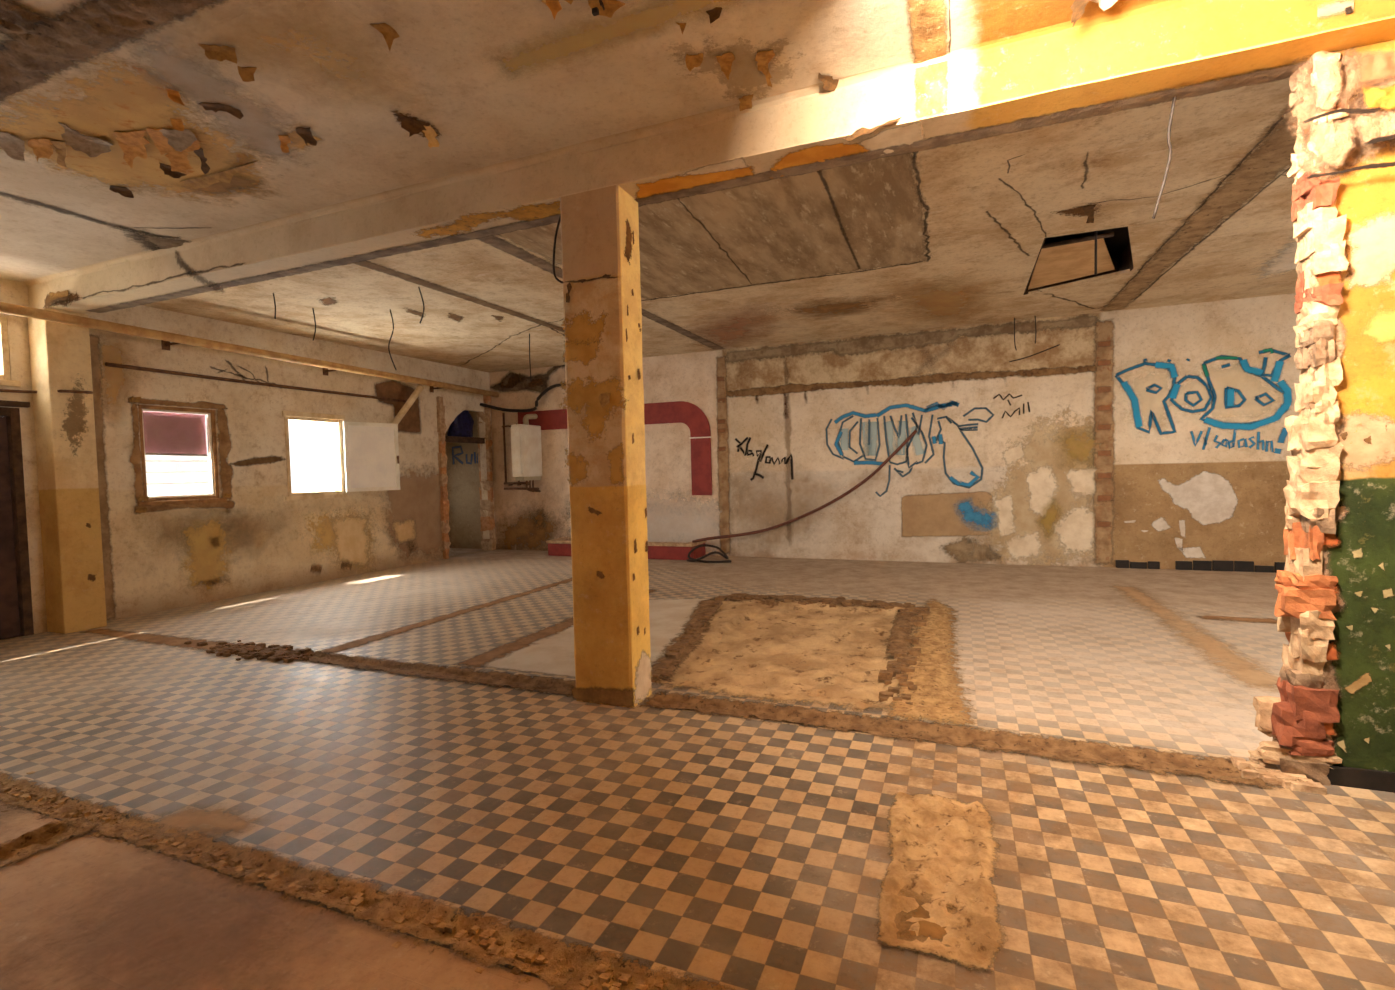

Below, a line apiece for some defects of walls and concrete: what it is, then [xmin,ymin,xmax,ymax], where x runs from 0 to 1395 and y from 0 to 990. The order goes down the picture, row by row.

peeling [370,23,400,51]
peeling [542,0,625,20]
peeling [706,7,722,24]
peeling [1071,0,1118,28]
peeling [0,0,321,200]
crack [1081,152,1235,204]
crack [986,155,1046,256]
peeling [43,201,562,313]
crack [1040,291,1107,309]
peeling [476,310,641,550]
spalling [624,48,1395,786]